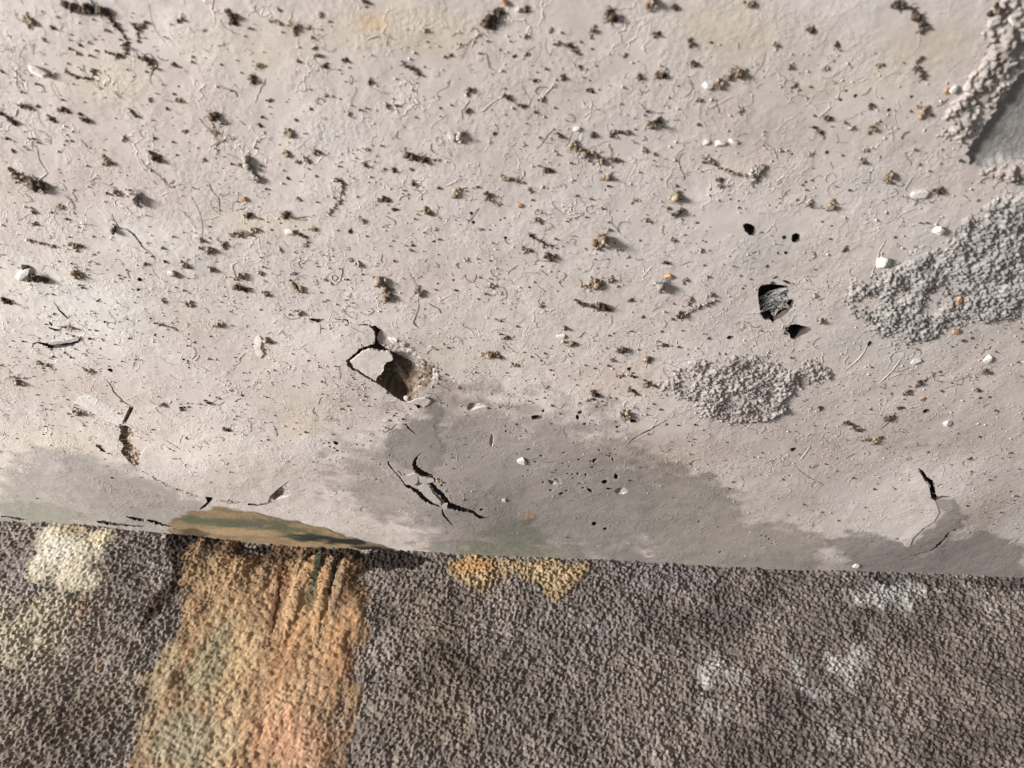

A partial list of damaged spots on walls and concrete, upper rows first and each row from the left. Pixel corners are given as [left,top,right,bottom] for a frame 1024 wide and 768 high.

peeling [840,0,1024,365]
spalling [758,276,812,339]
spalling [334,318,448,409]
peeling [656,352,834,426]
damp [0,444,394,672]
crack [383,423,491,526]
damp [347,400,1024,615]
crack [898,468,956,560]